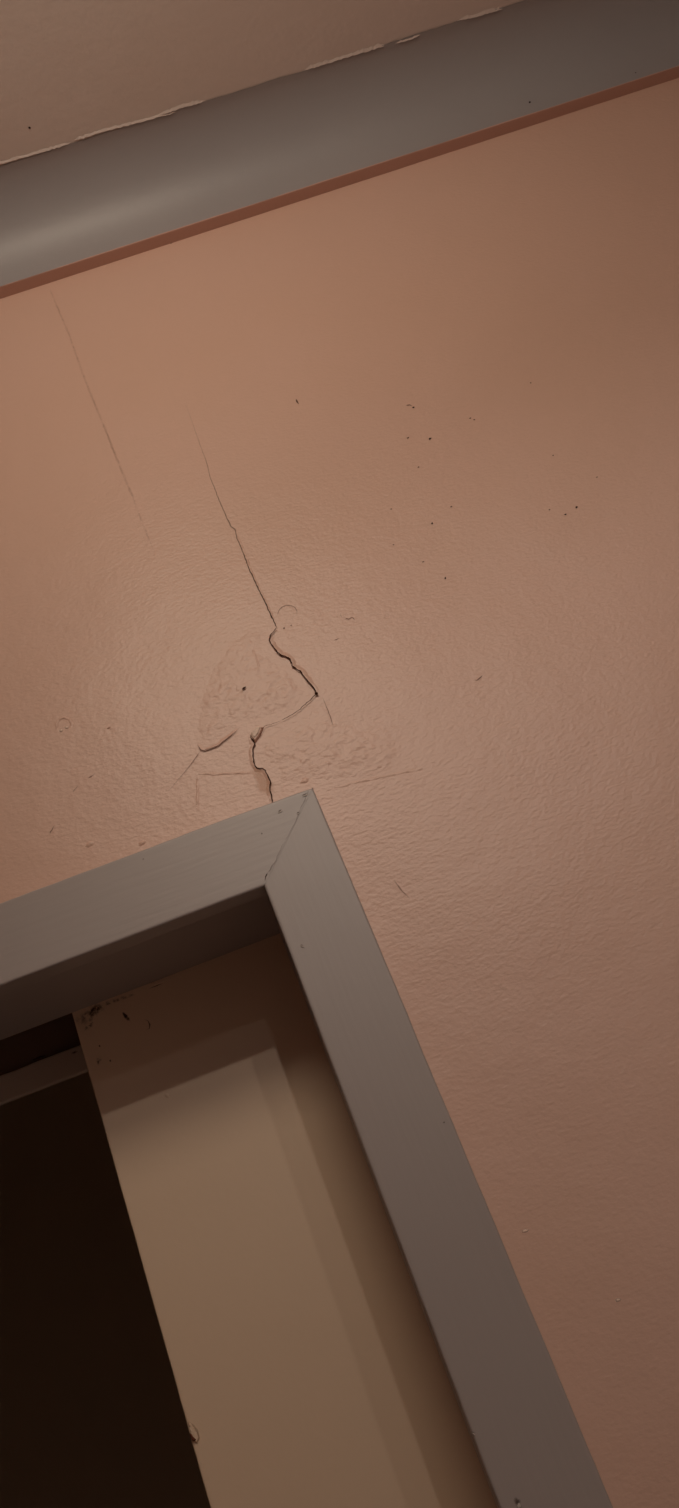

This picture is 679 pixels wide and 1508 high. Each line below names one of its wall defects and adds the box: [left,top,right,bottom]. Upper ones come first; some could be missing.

crack [192,498,319,803]